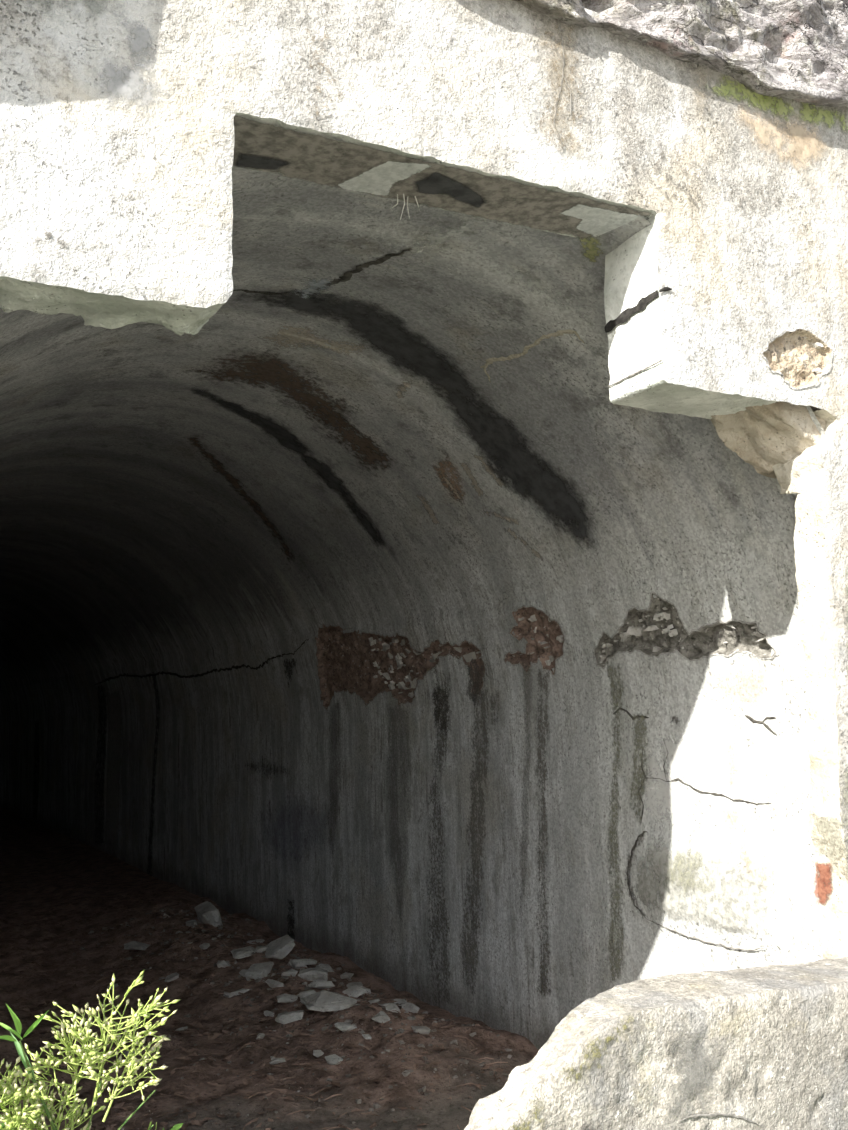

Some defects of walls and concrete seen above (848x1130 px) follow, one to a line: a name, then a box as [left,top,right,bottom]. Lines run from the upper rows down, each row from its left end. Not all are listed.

crack [233,248,412,295]
crack [480,287,672,382]
spalling [761,327,833,390]
damp [189,280,593,562]
crack [95,639,309,685]
spalling [315,624,485,710]
spalling [504,605,565,677]
spalling [594,592,779,669]
crack [613,707,768,821]
damp [428,659,499,1008]
damp [537,671,551,995]